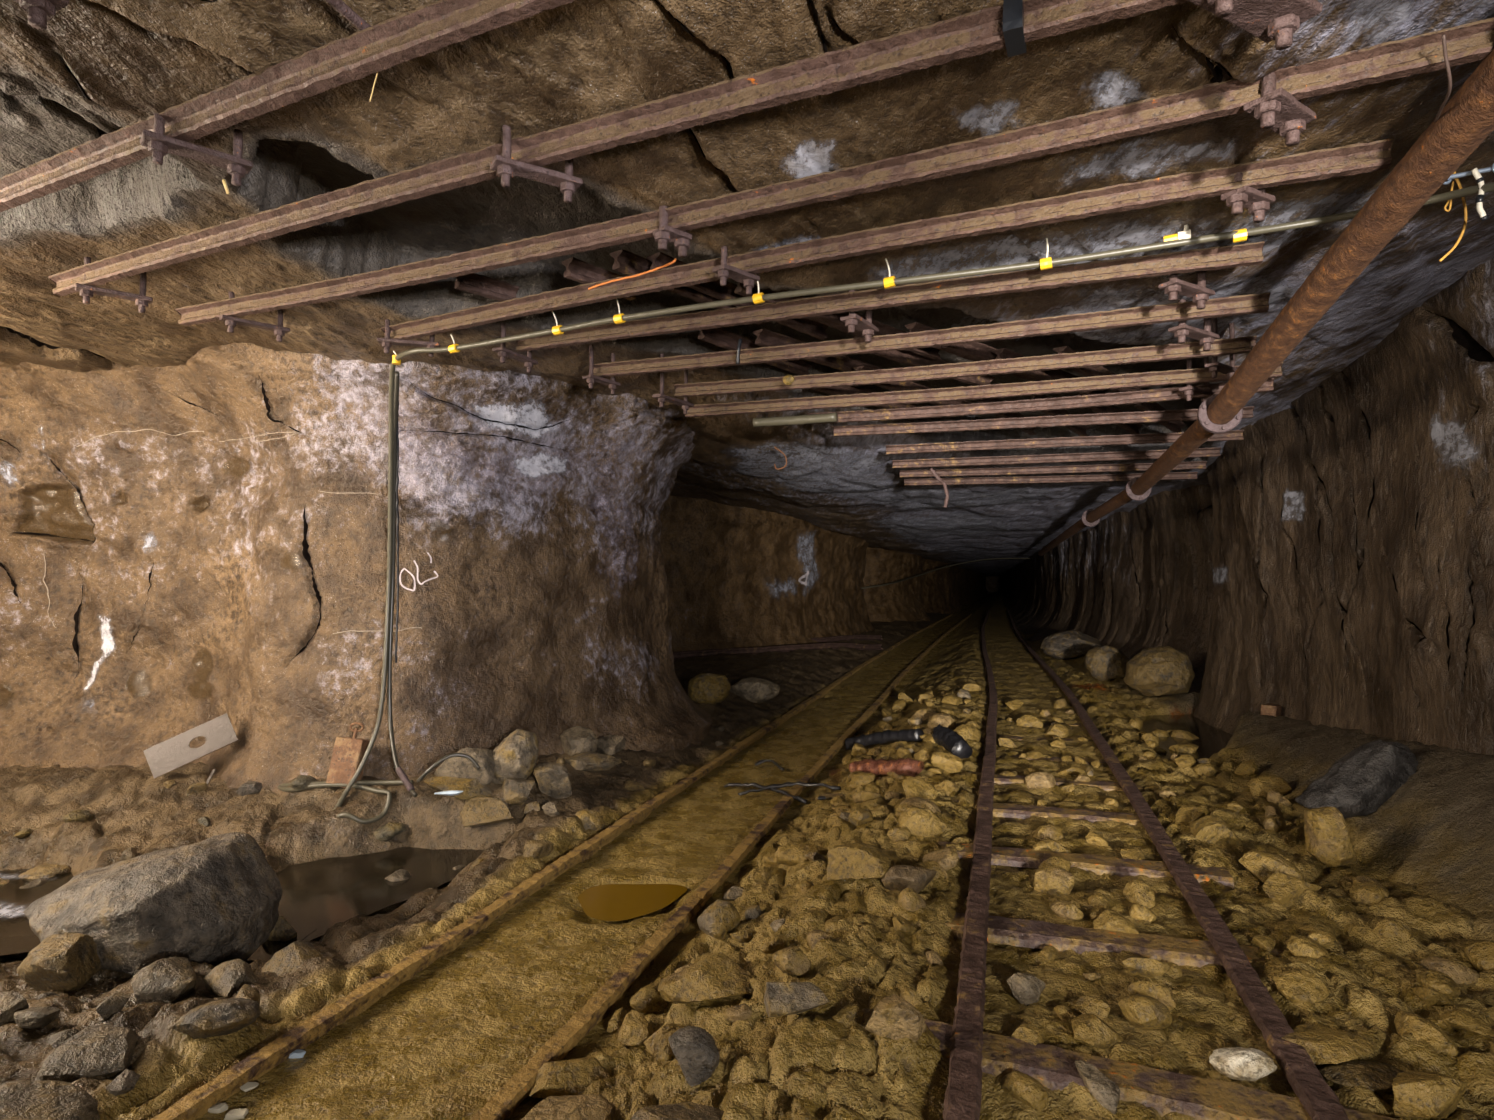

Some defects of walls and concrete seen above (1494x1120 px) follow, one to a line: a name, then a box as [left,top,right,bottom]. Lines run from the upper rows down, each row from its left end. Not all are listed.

crack [655,0,733,79]
crack [809,0,859,53]
water stain [476,404,567,477]
crack [1197,411,1484,691]